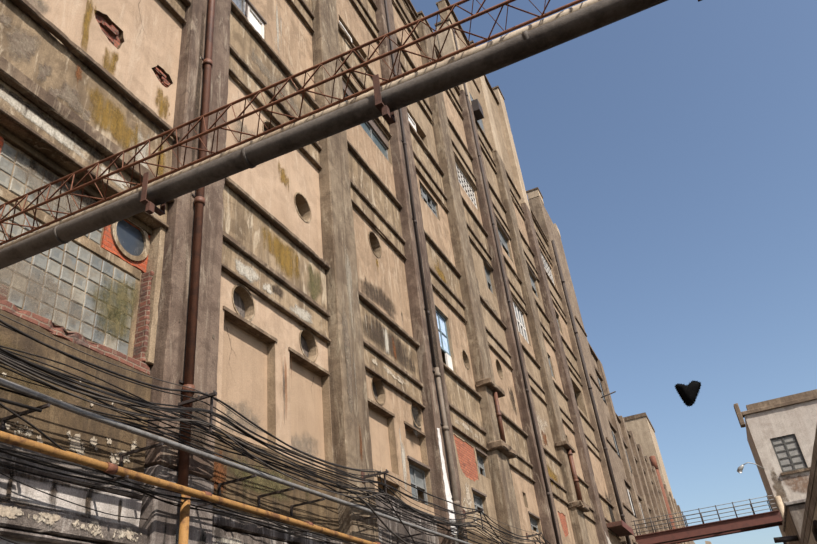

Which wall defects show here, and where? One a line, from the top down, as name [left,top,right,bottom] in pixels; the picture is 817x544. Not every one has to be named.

damp [82,0,96,47]
flaking render [95,13,121,48]
flaking render [152,67,170,88]
damp [264,228,299,277]
damp [309,267,321,301]
peeling [67,431,98,455]
peeling [107,438,137,465]
flaking render [453,434,478,523]
peeling [0,505,61,525]
peeling [73,520,103,538]
peeling [113,527,142,542]